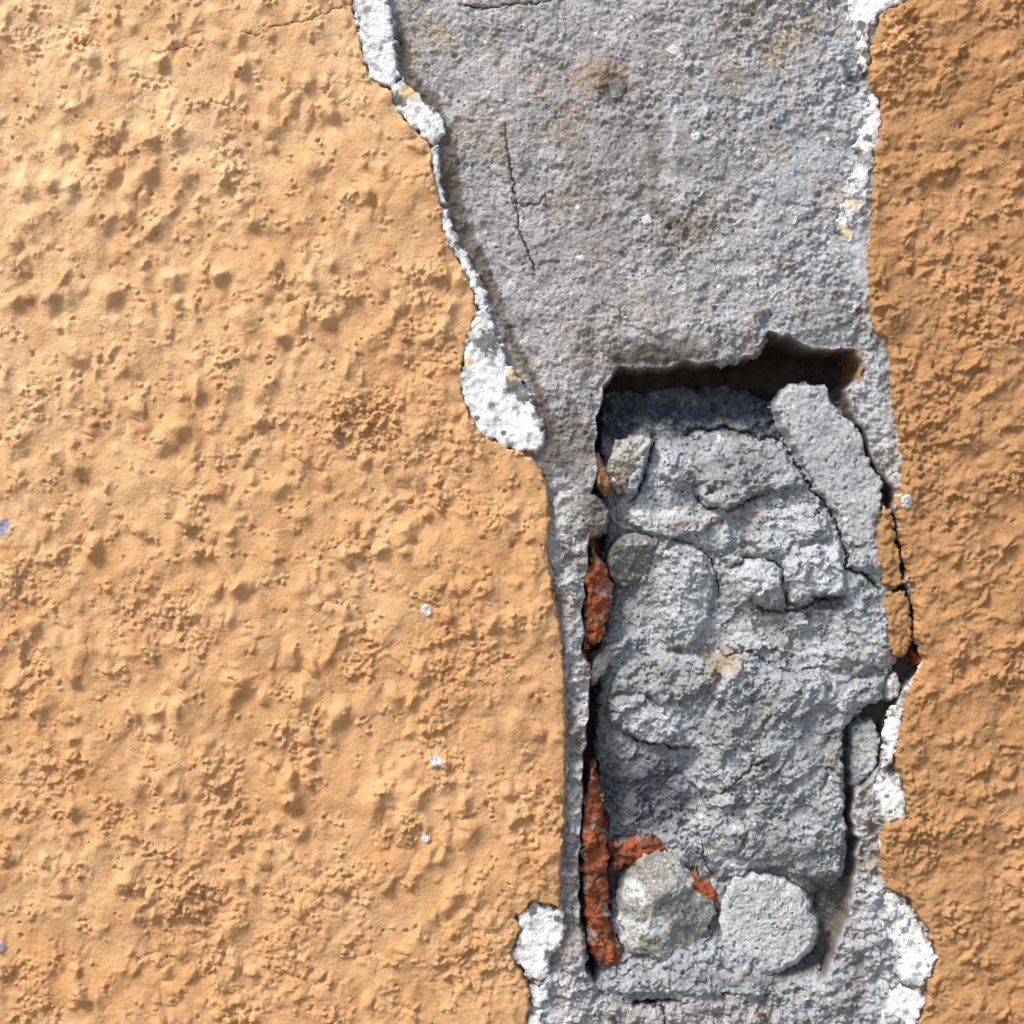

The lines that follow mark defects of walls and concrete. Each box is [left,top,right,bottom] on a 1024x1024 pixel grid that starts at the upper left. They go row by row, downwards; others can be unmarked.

crack [505,129,545,273]
spalling [352,0,939,1024]